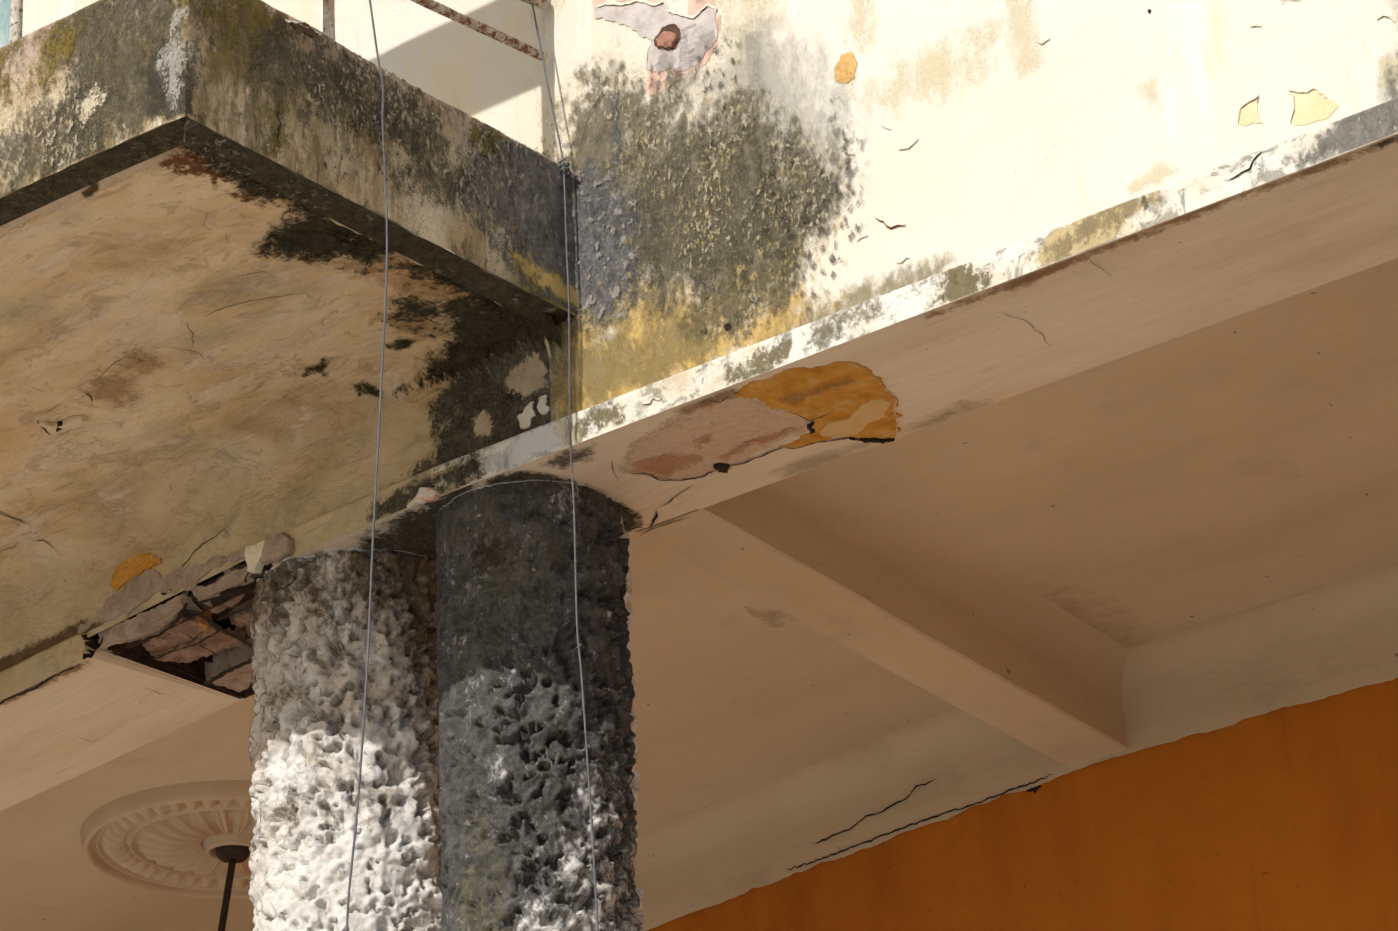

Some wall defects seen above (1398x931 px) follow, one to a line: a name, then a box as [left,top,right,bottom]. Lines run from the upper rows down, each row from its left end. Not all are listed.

flaking render [592,0,722,97]
peeling [1237,94,1262,126]
peeling [1288,86,1339,126]
damp [1285,70,1398,165]
damp [0,0,992,931]
peeling [618,361,903,480]
crack [0,512,62,557]
spalling [77,532,295,692]
crack [0,662,89,705]
crack [784,774,1051,871]